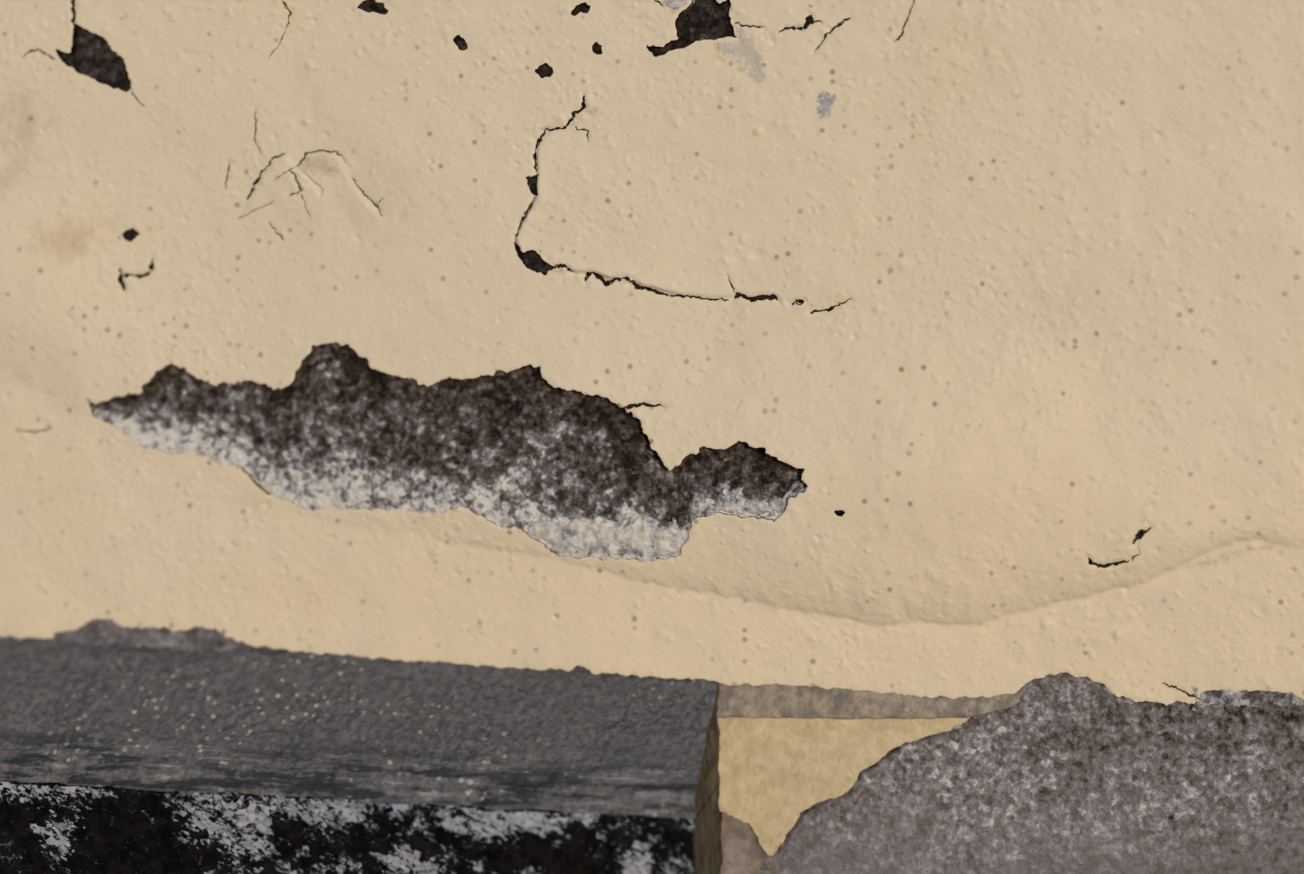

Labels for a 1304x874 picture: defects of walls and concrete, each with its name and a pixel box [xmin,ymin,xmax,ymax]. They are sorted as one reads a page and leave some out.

crack [23,49,55,59]
crack [69,0,77,27]
peeling [357,0,388,15]
peeling [453,35,468,51]
peeling [571,2,591,16]
spalling [646,0,737,57]
crack [515,95,589,237]
crack [118,257,154,291]
crack [556,263,852,314]
spalling [87,342,808,562]
crack [1088,527,1151,568]
spalling [718,672,1304,874]